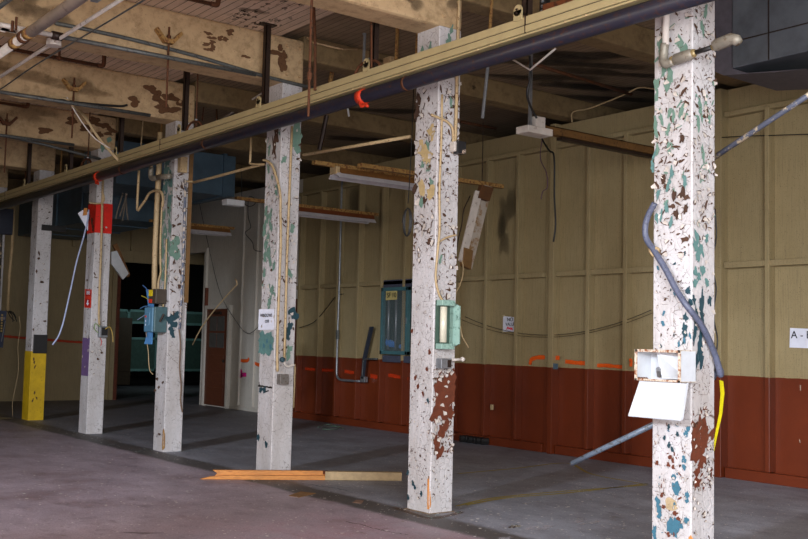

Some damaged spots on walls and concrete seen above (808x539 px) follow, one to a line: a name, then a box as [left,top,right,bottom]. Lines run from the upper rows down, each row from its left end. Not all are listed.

peeling [143,85,182,114]
peeling [202,0,304,52]
peeling [160,160,189,338]
peeling [258,122,303,361]
peeling [411,81,462,351]
peeling [650,1,718,393]
peeling [406,365,457,502]
peeling [652,406,715,539]